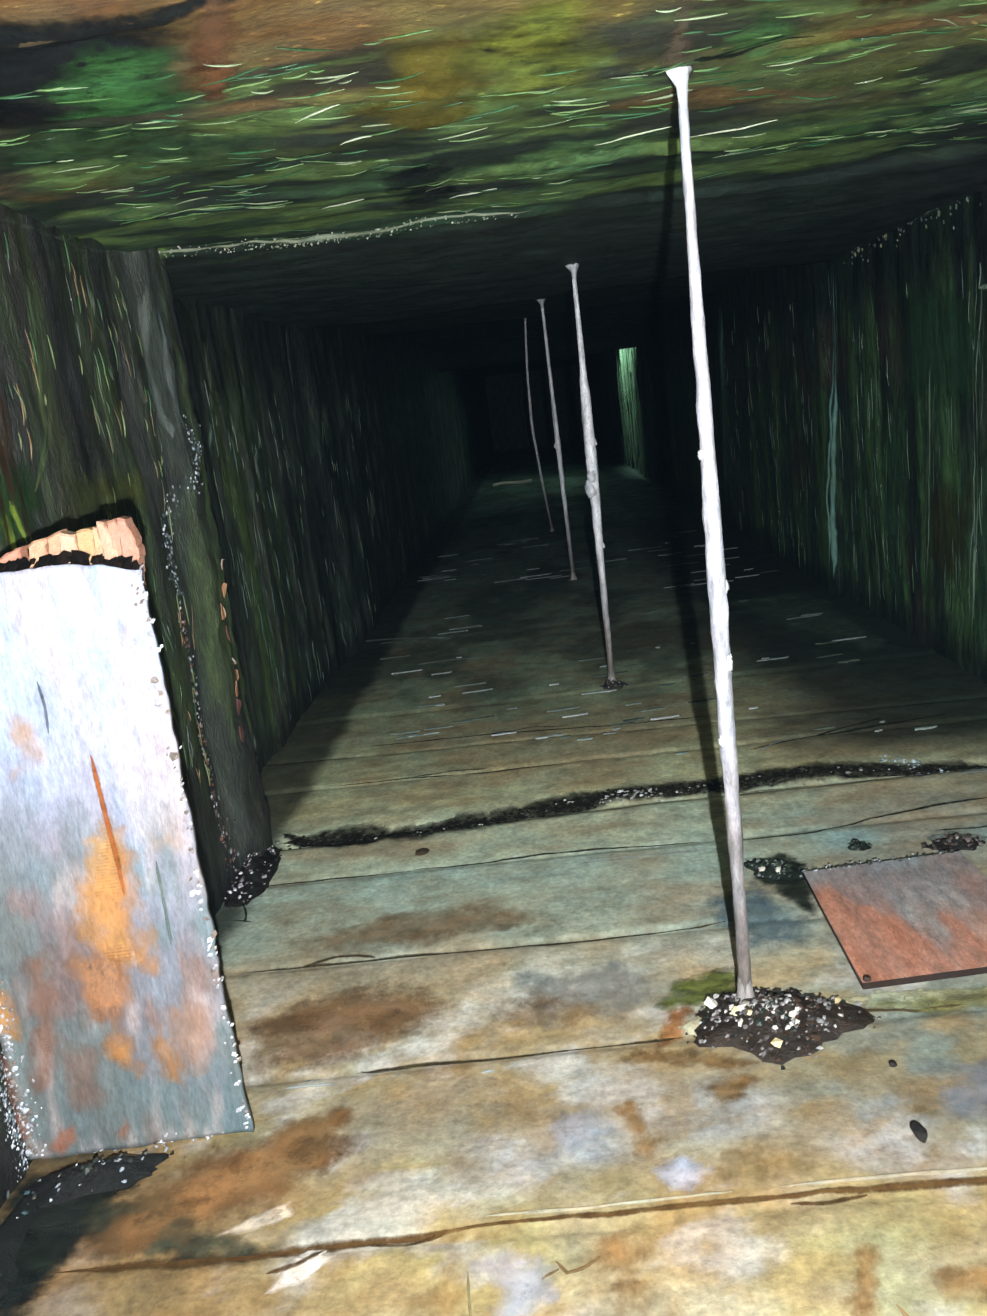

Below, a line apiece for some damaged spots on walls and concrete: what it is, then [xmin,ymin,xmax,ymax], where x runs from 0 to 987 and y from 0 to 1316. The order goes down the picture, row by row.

leakage [0,29,176,128]
leakage [851,197,981,265]
crack [366,715,711,747]
crack [330,757,619,786]
crack [746,797,987,840]
rust [802,850,961,872]
rust [76,755,155,1020]
crack [57,1167,987,1274]
crack [542,1255,601,1279]